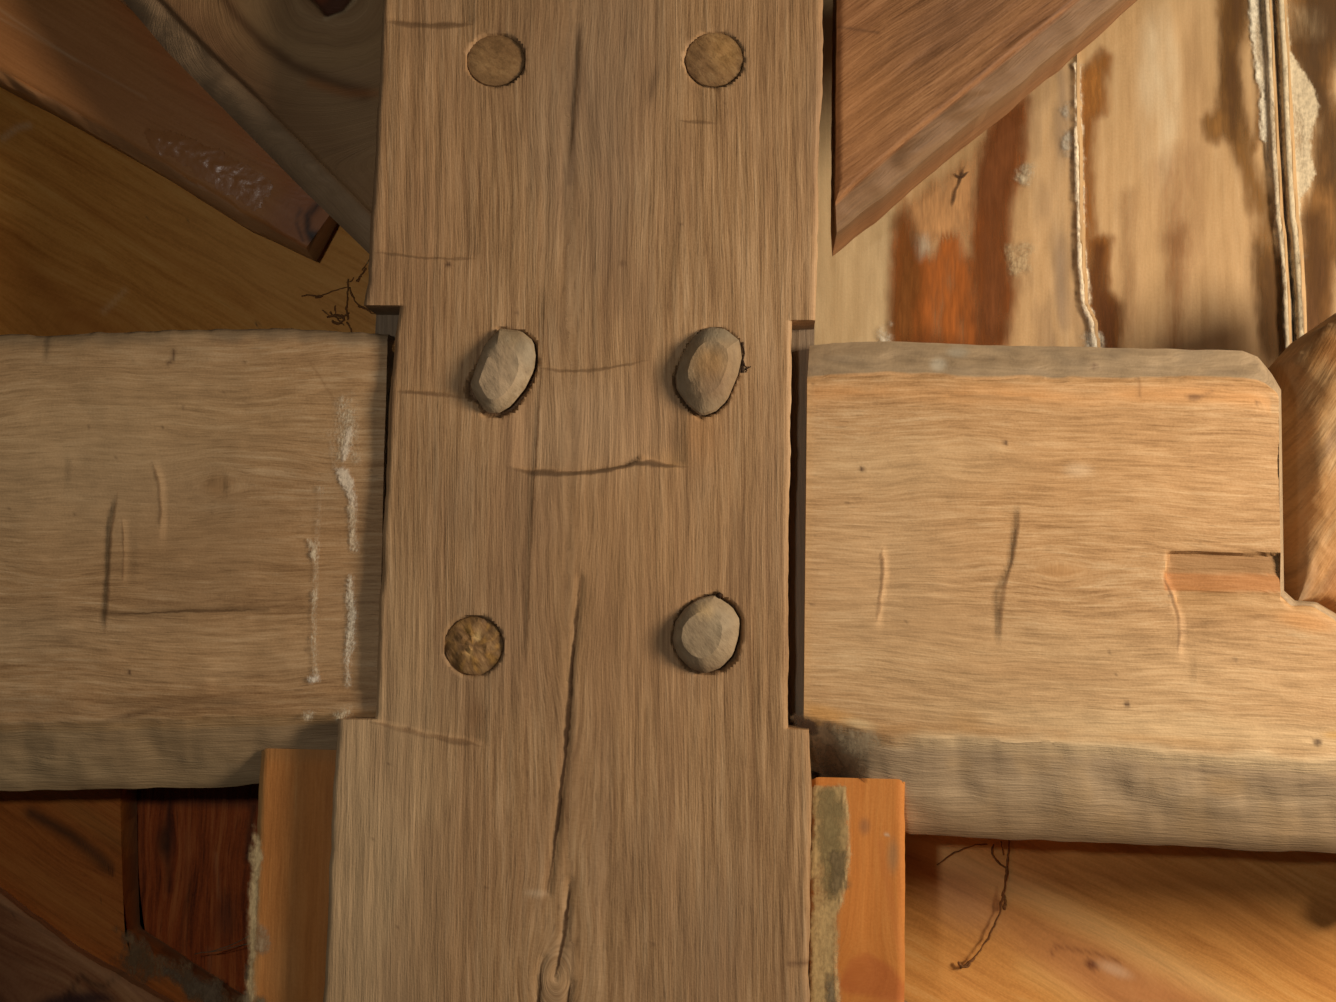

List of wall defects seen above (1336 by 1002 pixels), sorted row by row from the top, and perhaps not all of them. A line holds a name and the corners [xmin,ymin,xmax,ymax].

water stain [912,164,975,254]
water stain [1204,0,1336,360]
water stain [336,427,358,551]
water stain [307,539,320,682]
crack [553,603,580,858]
crack [537,890,571,1002]